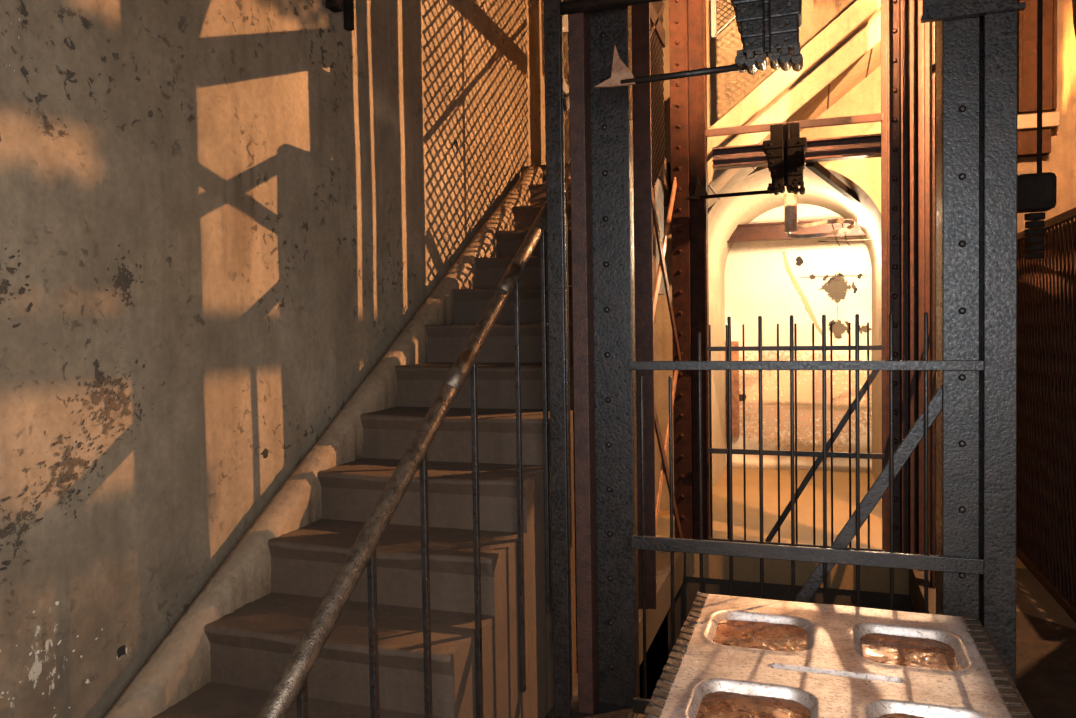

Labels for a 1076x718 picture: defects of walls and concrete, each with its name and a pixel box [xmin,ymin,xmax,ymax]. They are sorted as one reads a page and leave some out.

spalling [795,256,862,303]
spalling [828,319,872,346]
peeling [0,360,153,570]